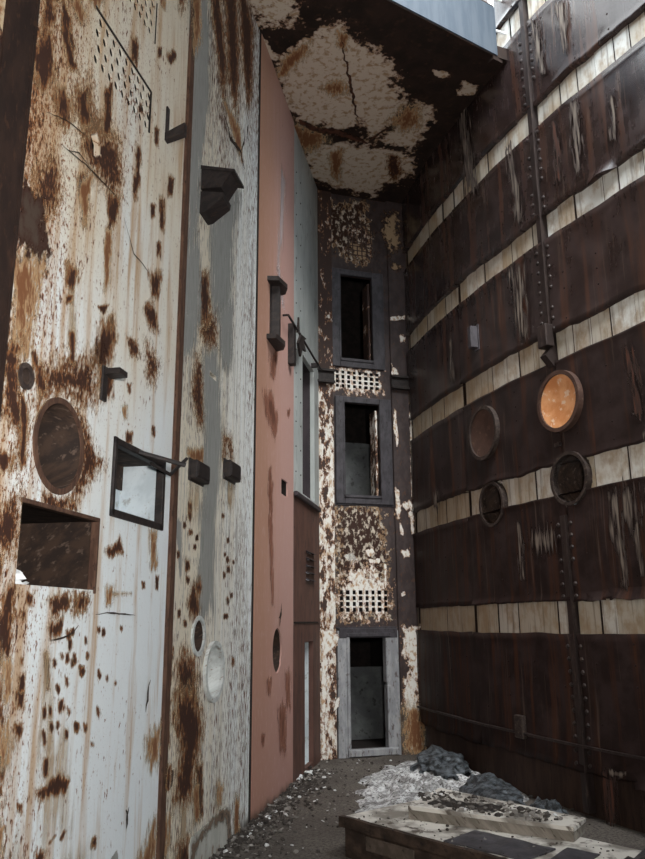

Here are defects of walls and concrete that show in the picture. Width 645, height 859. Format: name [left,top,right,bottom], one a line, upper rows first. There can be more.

corrosion [33,0,142,288]
corrosion [178,0,254,163]
peeling [248,0,438,272]
crack [299,42,391,144]
peeling [432,69,451,78]
peeling [456,80,479,96]
corrosion [0,143,116,512]
corrosion [128,269,162,385]
peeling [333,363,399,398]
peeling [393,485,416,536]
corrosion [0,483,33,813]
corrosion [137,645,206,859]